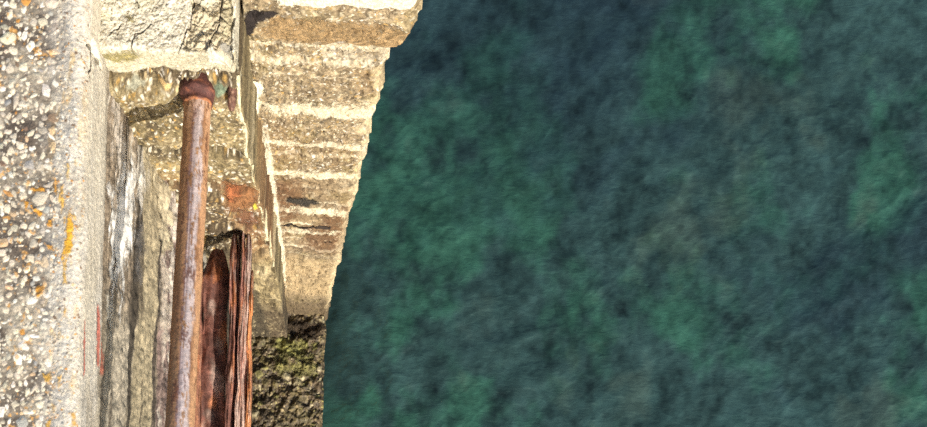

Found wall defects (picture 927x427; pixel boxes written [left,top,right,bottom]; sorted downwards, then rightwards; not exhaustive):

crack [180,0,233,49]
rust [194,181,257,427]